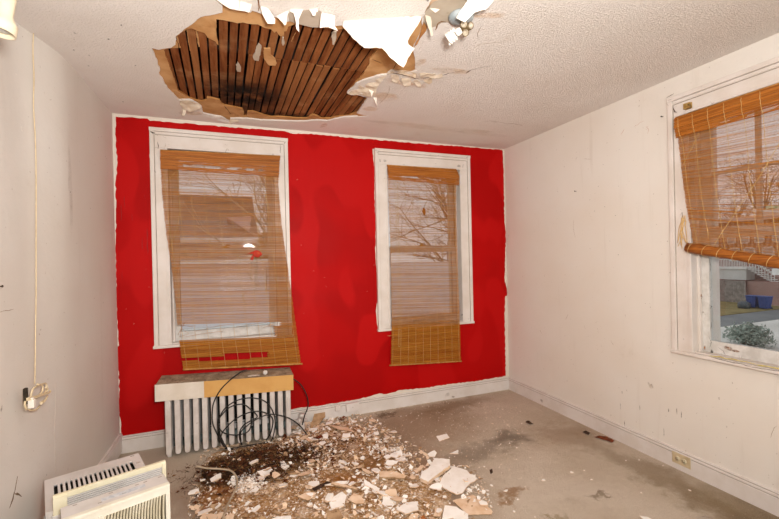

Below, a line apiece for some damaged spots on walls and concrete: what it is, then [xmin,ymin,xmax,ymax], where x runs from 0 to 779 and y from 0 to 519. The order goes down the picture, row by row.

flaking render [217,0,493,106]
flaking render [180,100,239,124]